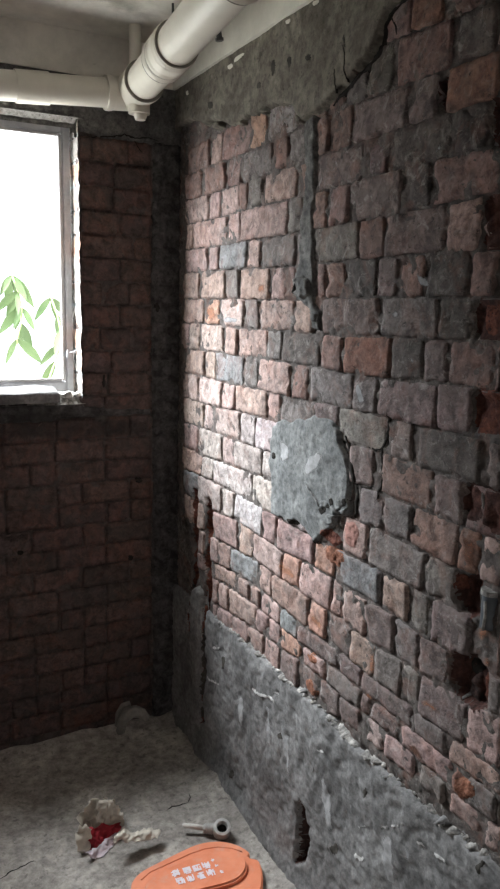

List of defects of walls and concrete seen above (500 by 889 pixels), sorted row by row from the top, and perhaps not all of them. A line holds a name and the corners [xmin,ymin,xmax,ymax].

flaking render [175,0,402,133]
crack [333,0,407,106]
spalling [320,522,359,567]
flaking render [206,612,491,874]